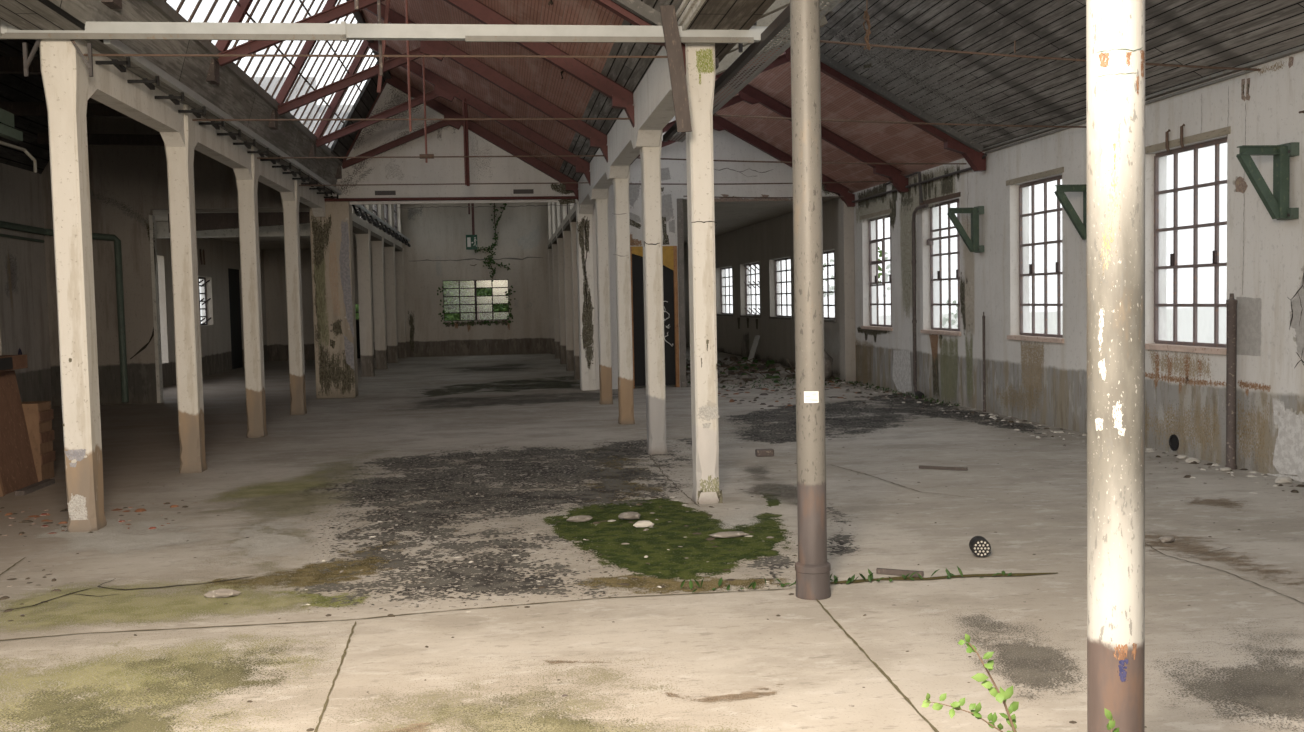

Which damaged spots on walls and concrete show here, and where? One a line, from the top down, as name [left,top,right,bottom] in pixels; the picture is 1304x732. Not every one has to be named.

rust [1099,52,1110,67]
rust [1126,50,1145,94]
leakage [992,340,1045,413]
peeling [1098,308,1106,381]
rust [1145,350,1271,396]
crack [1288,273,1304,367]
peeling [1095,400,1126,436]
flaking render [1268,396,1304,482]